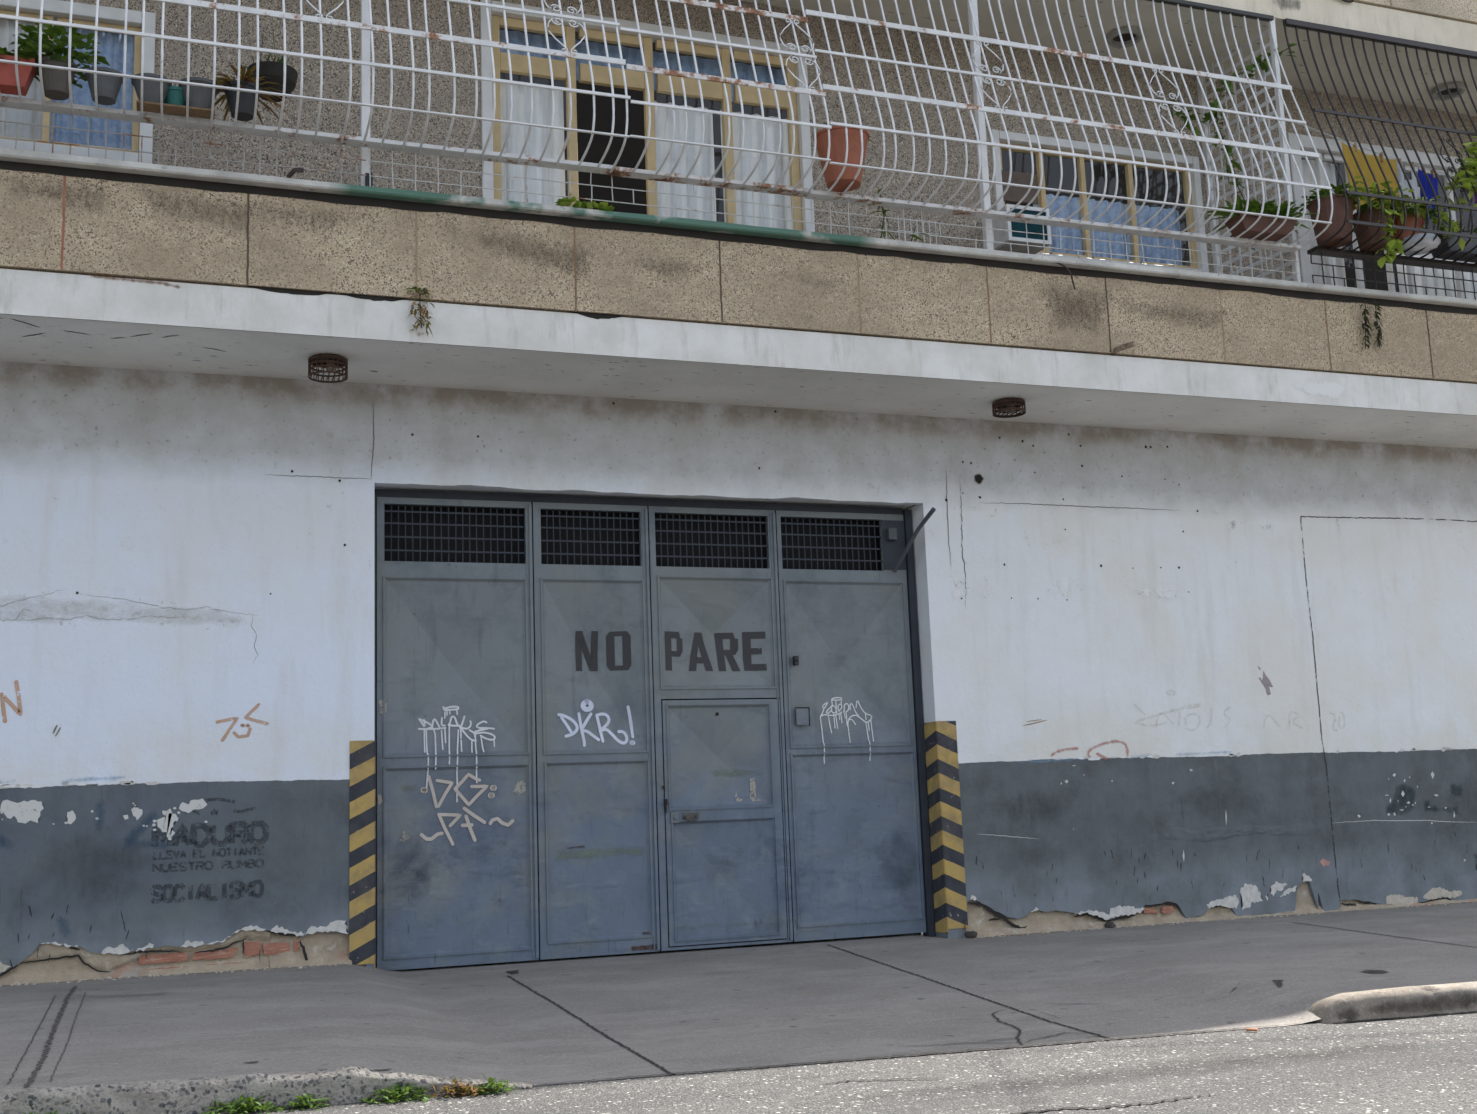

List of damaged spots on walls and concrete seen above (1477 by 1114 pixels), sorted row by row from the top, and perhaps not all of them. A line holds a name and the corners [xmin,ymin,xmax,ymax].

peeling [0,779,161,825]
peeling [123,799,208,840]
flaking render [964,859,1477,938]
flaking render [0,920,352,985]
crack [536,1003,1298,1085]